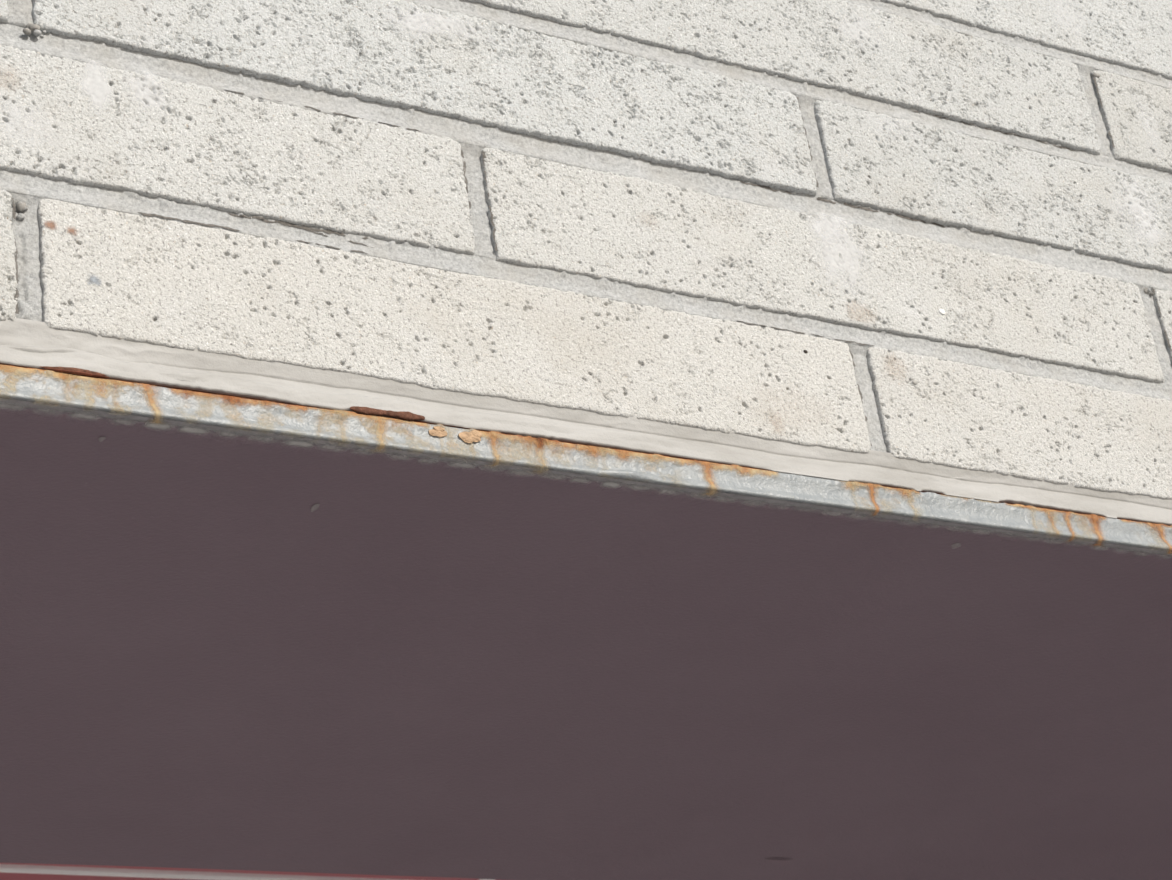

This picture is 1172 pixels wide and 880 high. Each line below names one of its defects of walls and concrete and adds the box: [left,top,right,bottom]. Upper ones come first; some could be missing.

rust [0,364,161,423]
rust [171,388,428,452]
rust [475,429,777,495]
rust [846,481,919,515]
rust [947,495,1105,545]
rust [1121,519,1172,554]